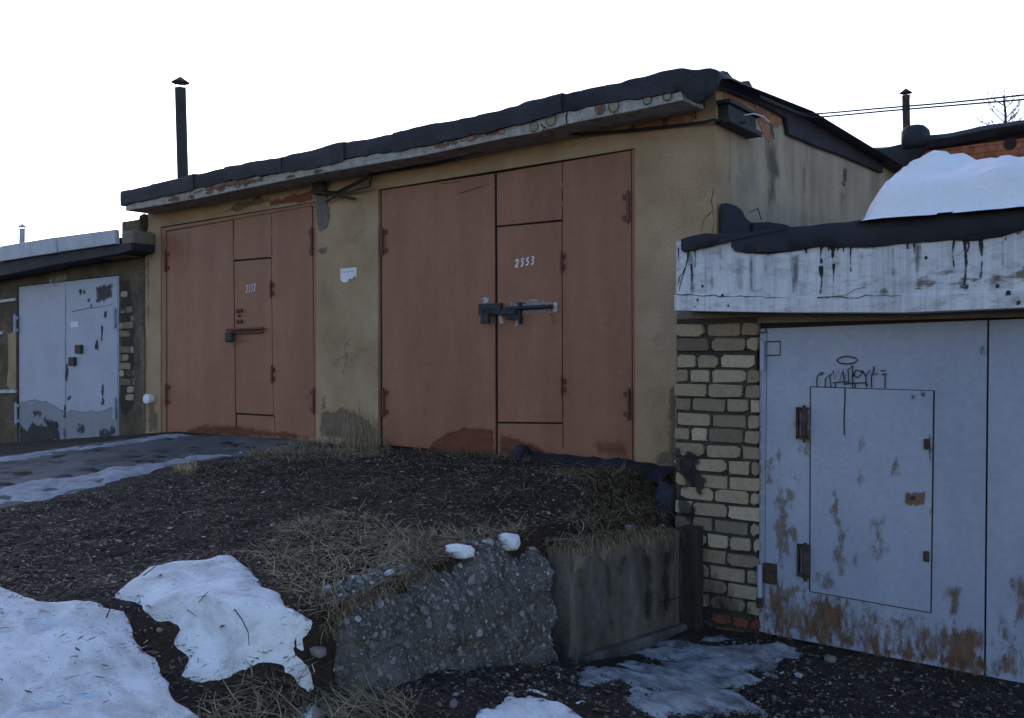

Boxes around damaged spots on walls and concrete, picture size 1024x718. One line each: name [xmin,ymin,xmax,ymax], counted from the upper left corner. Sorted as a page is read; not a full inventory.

flaking render [723,91,784,142]
leakage [819,247,852,294]
leakage [952,240,983,286]
peeling [19,281,143,440]
leakage [320,404,373,443]
corrosion [429,428,545,455]
corrosion [761,489,1017,676]